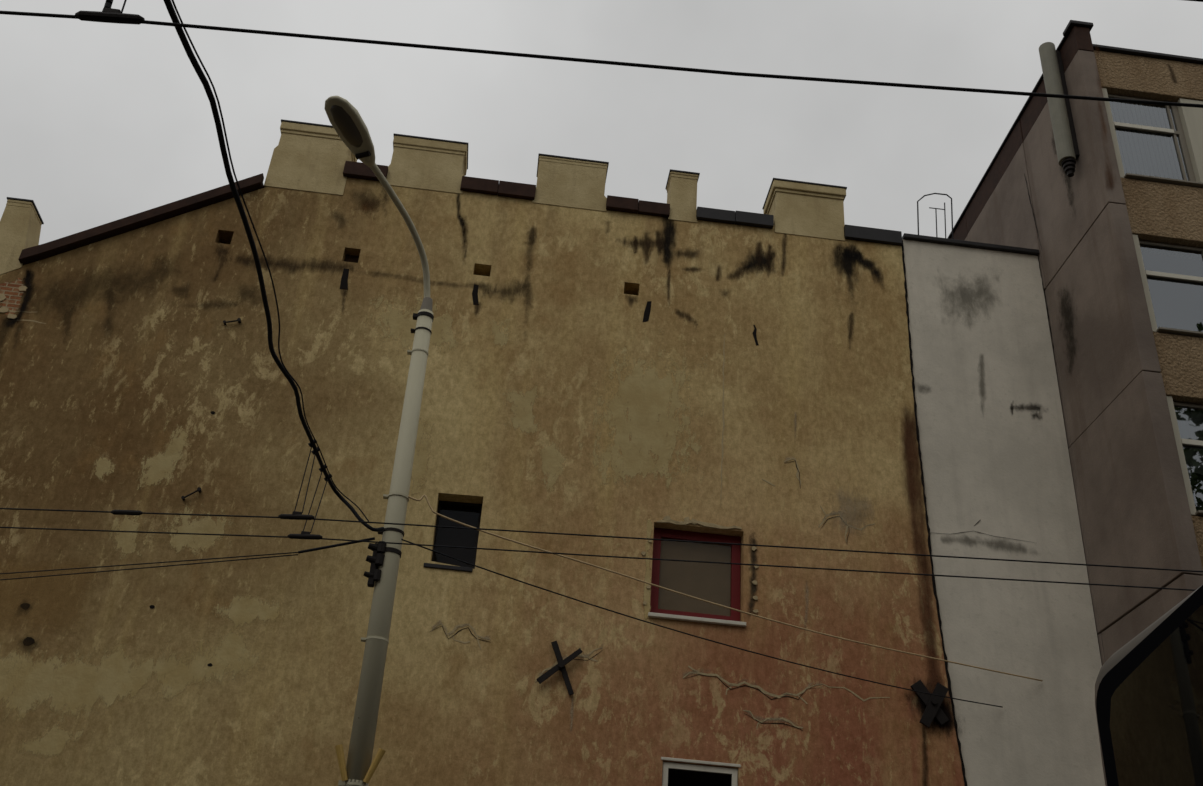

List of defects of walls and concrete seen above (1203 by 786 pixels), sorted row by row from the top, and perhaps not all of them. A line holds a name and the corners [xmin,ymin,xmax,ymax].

water stain [624,217,698,297]
water stain [716,234,786,280]
water stain [834,245,881,289]
spalling [0,278,46,324]
water stain [903,413,954,786]
crack [430,623,491,650]